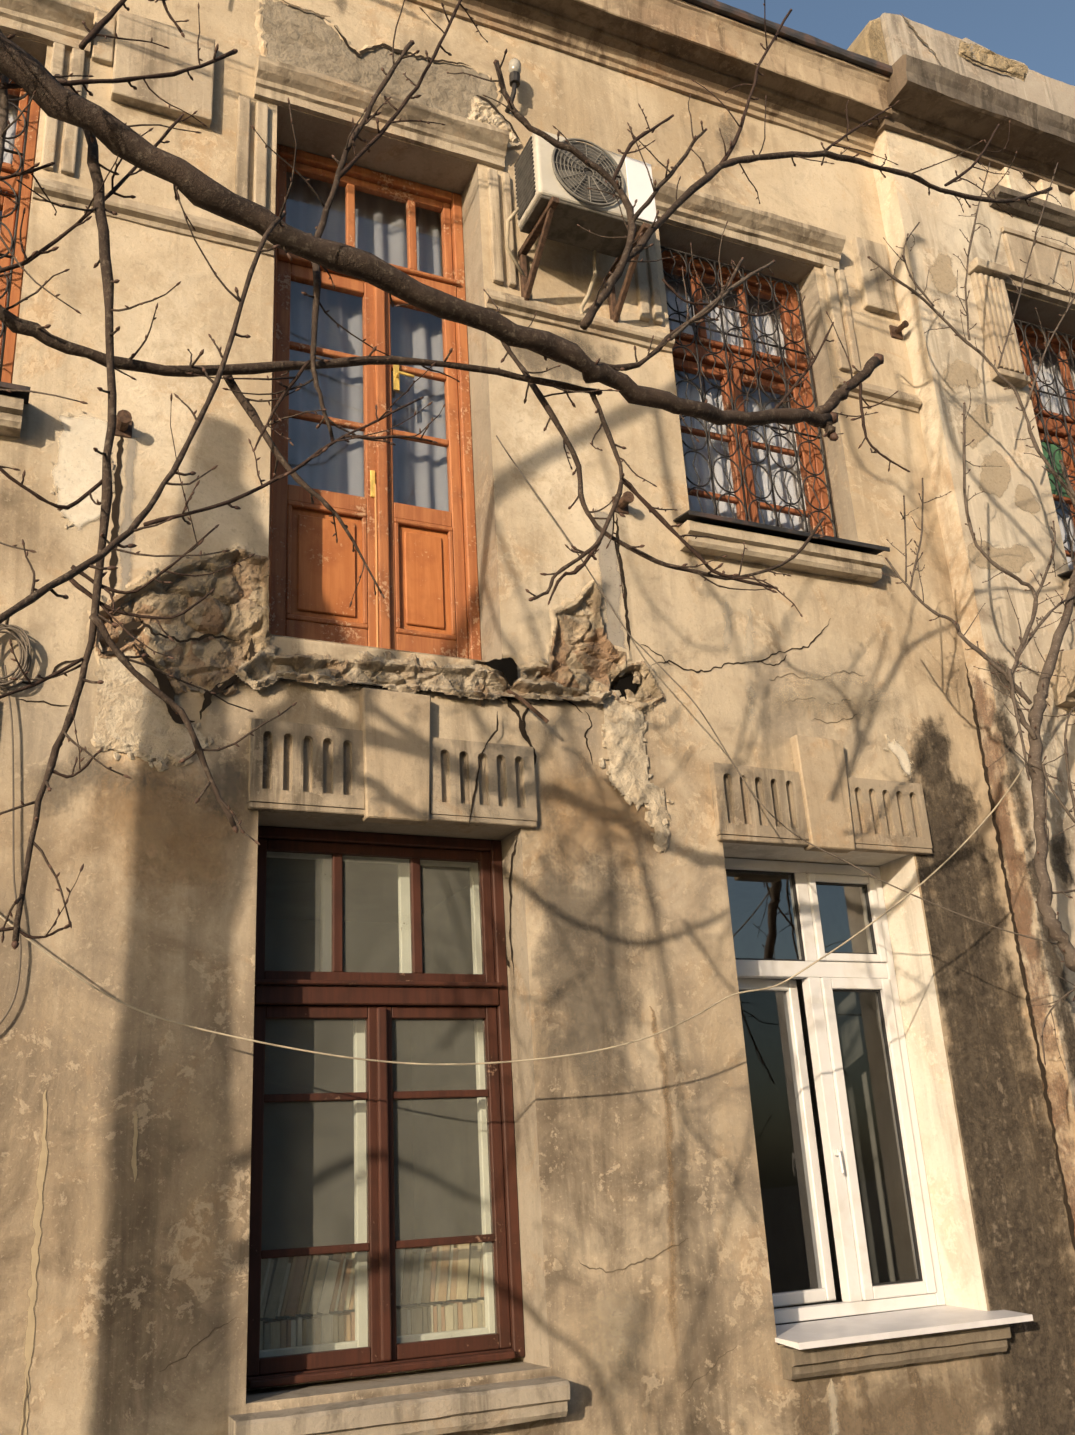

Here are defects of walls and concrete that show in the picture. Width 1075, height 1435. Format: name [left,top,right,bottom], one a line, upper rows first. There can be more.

flaking render [254,0,521,147]
flaking render [50,411,275,772]
flaking render [517,510,665,730]
crack [616,514,877,724]
peeling [644,811,668,853]
damp [797,658,1075,1435]
crack [19,1090,48,1435]